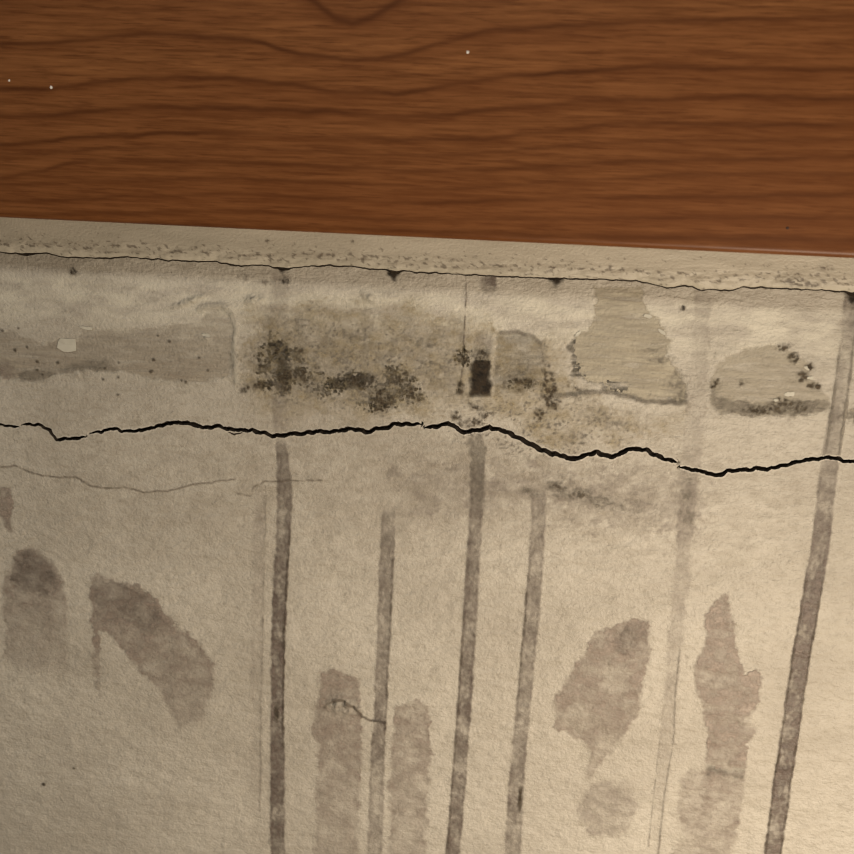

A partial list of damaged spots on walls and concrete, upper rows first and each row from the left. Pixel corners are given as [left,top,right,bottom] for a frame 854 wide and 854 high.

crack [0,418,854,479]
leakage [515,361,566,437]
peeling [556,286,687,405]
peeling [711,345,827,417]
leakage [89,584,214,687]
leakage [270,454,292,854]
leakage [457,532,479,726]
leakage [554,619,649,749]
leakage [695,596,761,807]
leakage [765,511,832,854]
leakage [446,775,466,854]
leakage [508,744,526,817]